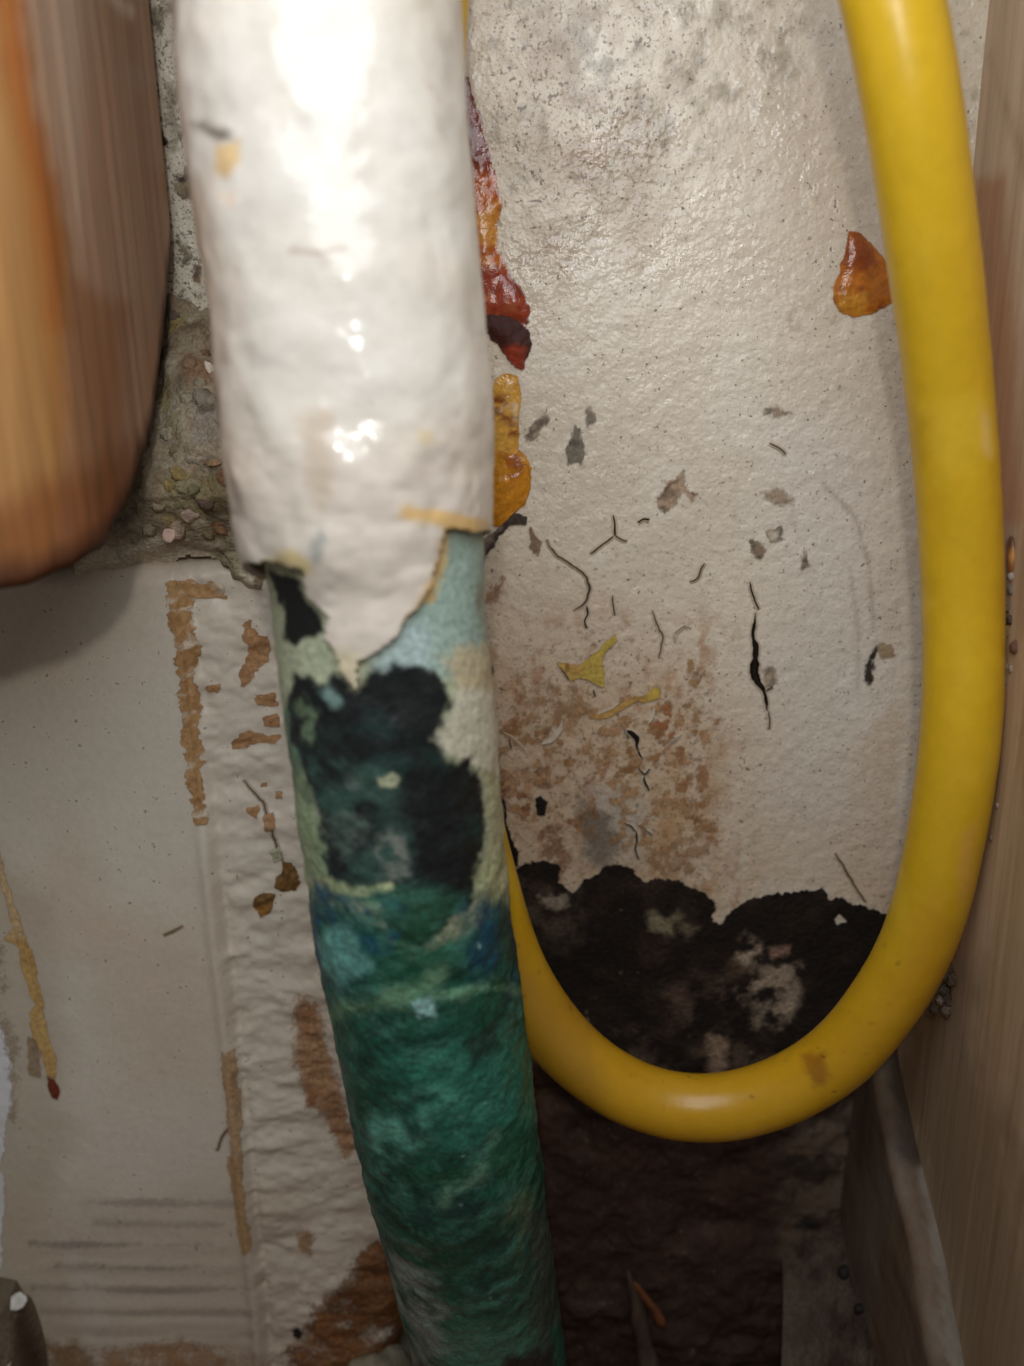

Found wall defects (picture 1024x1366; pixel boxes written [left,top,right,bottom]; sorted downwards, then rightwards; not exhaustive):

rust [465,77,532,527]
rust [833,231,892,317]
peeling [484,512,542,556]
peeling [565,406,596,464]
crack [544,515,650,630]
peeling [657,470,697,513]
peeling [231,619,281,749]
crack [650,609,666,659]
crack [747,581,774,730]
peeling [253,861,301,918]
water stain [498,659,887,1073]
water stain [285,1241,404,1366]